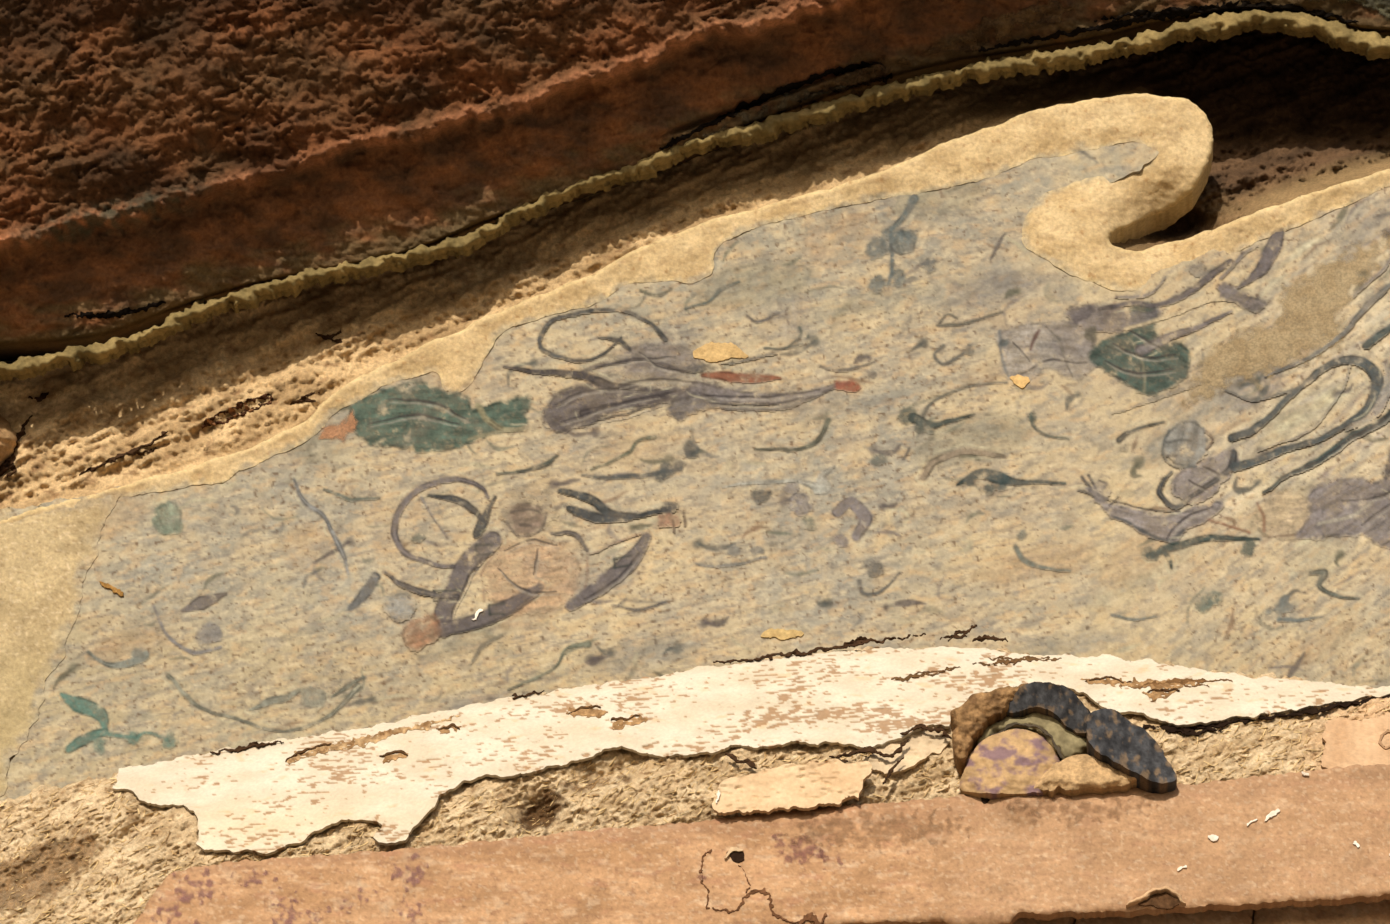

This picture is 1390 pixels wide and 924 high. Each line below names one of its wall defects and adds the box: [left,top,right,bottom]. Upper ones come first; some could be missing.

crack [713,625,1062,682]
flaking render [112,646,1390,856]
crack [699,849,827,924]